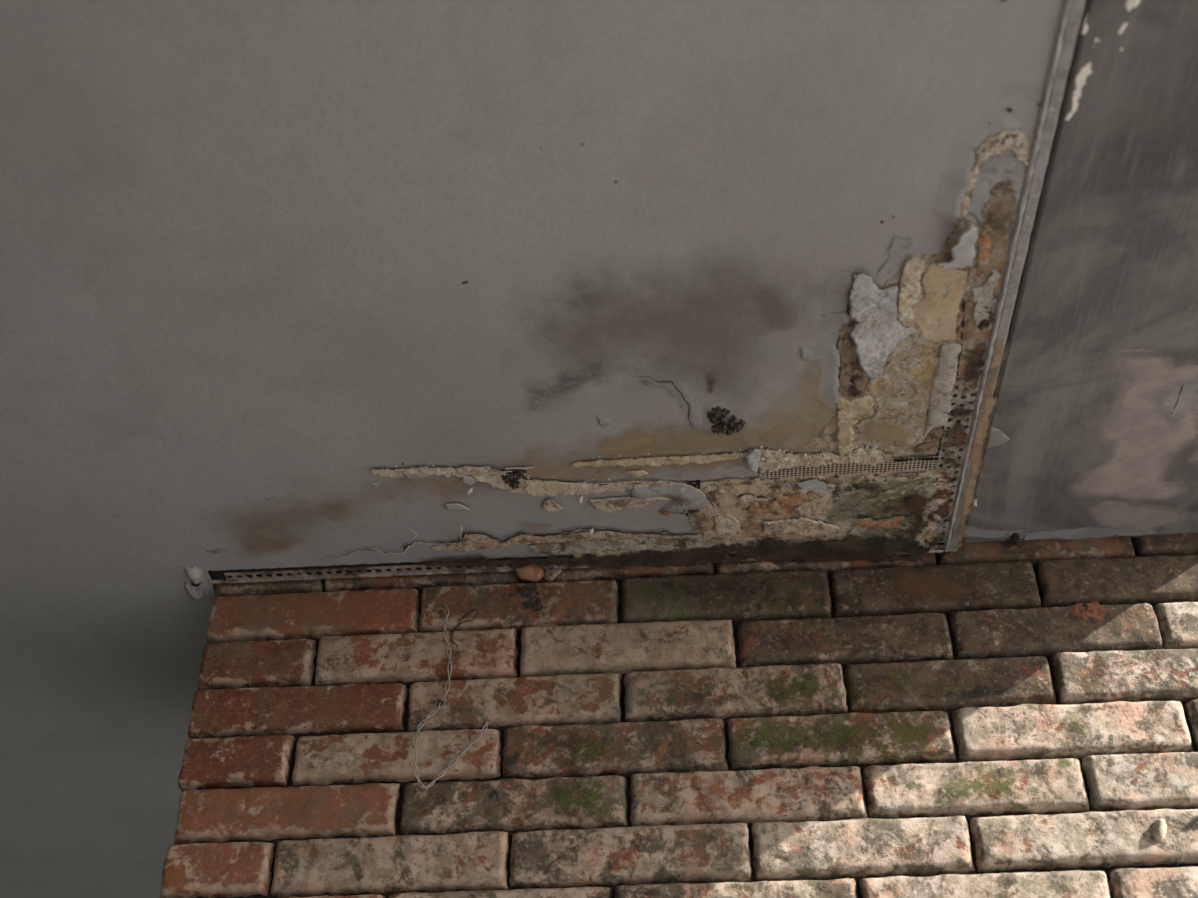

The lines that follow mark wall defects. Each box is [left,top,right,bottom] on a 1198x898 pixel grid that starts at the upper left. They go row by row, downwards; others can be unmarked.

flaking render [320,111,1029,560]
water stain [421,343,986,569]